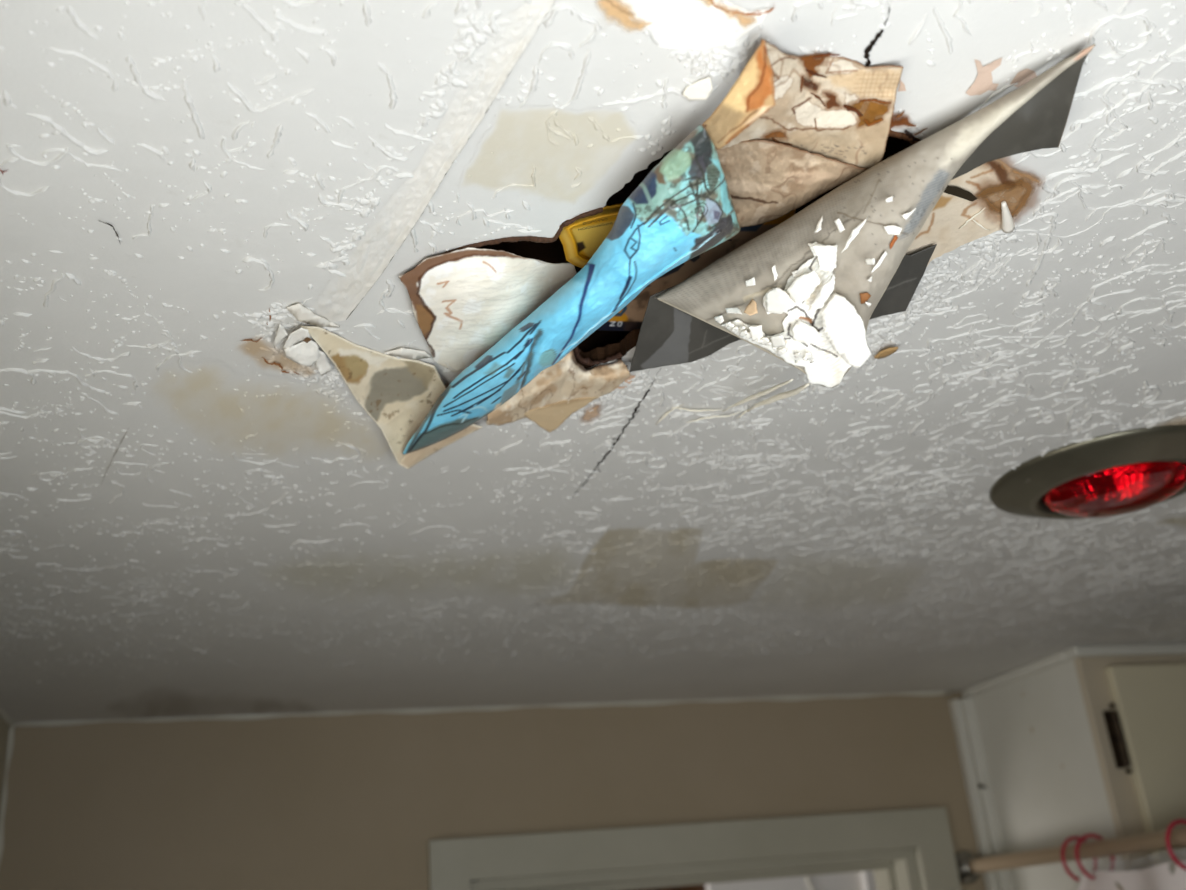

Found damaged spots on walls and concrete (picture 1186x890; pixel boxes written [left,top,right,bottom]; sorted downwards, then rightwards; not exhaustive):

flaking render [619,0,770,50]
crack [864,7,890,66]
peeling [274,44,1096,469]
crack [572,372,658,498]
water stain [255,525,936,618]